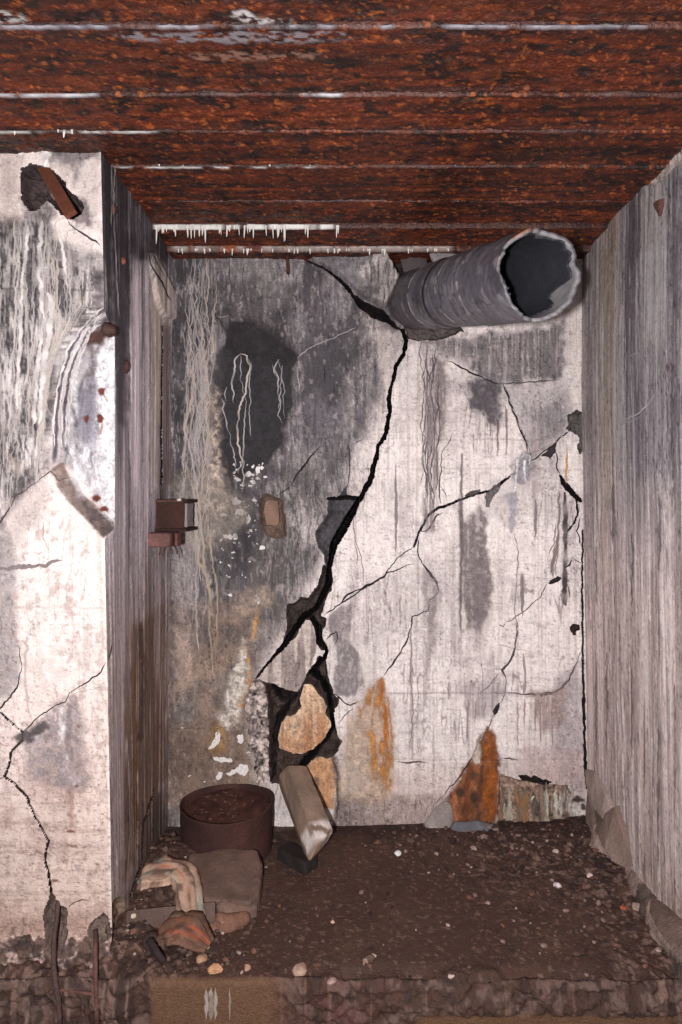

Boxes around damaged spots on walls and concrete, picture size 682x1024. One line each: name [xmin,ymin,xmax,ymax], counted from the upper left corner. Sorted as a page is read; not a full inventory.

spalling [19,163,84,219]
leakage [111,166,129,311]
leakage [0,219,171,588]
crack [274,448,326,500]
leakage [154,224,450,679]
crack [297,260,587,806]
spalling [203,487,360,819]
crack [0,644,112,894]
rust [339,678,394,800]
rust [447,726,500,823]
spalling [497,774,574,823]